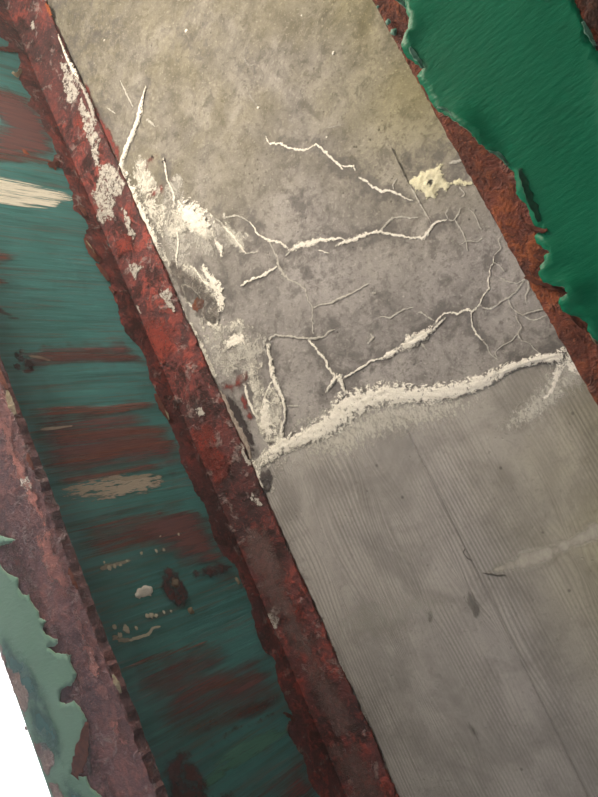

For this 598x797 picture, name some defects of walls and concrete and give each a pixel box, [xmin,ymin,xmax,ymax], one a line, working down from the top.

rust [85,85,120,161]
crack [216,136,546,395]
peeling [373,0,598,404]
rust [0,368,17,416]
rust [13,351,137,373]
peeling [0,0,347,797]
rust [0,419,101,678]
rust [161,567,195,614]
rust [0,644,64,797]
rust [71,722,92,780]